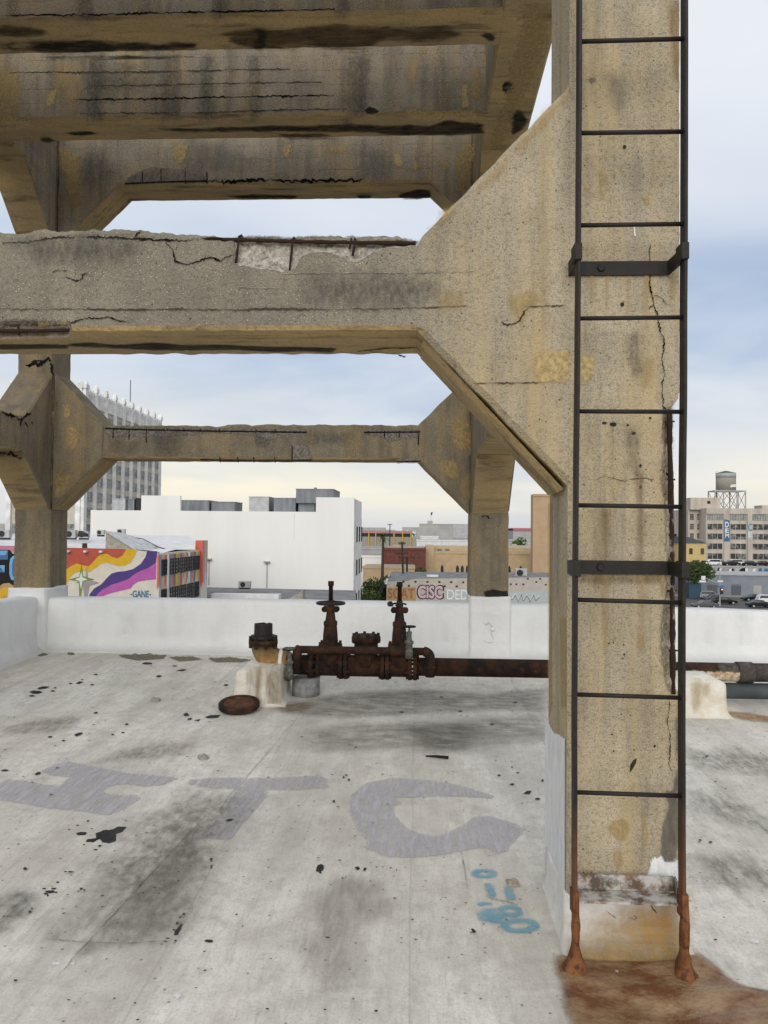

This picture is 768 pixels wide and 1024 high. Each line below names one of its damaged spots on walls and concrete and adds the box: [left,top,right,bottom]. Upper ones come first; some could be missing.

water stain [0,25,484,140]
spalling [124,145,208,185]
crack [207,177,362,185]
crack [4,217,231,265]
spalling [205,234,420,272]
crack [649,245,668,410]
crack [26,356,54,375]
rust [556,910,768,1024]